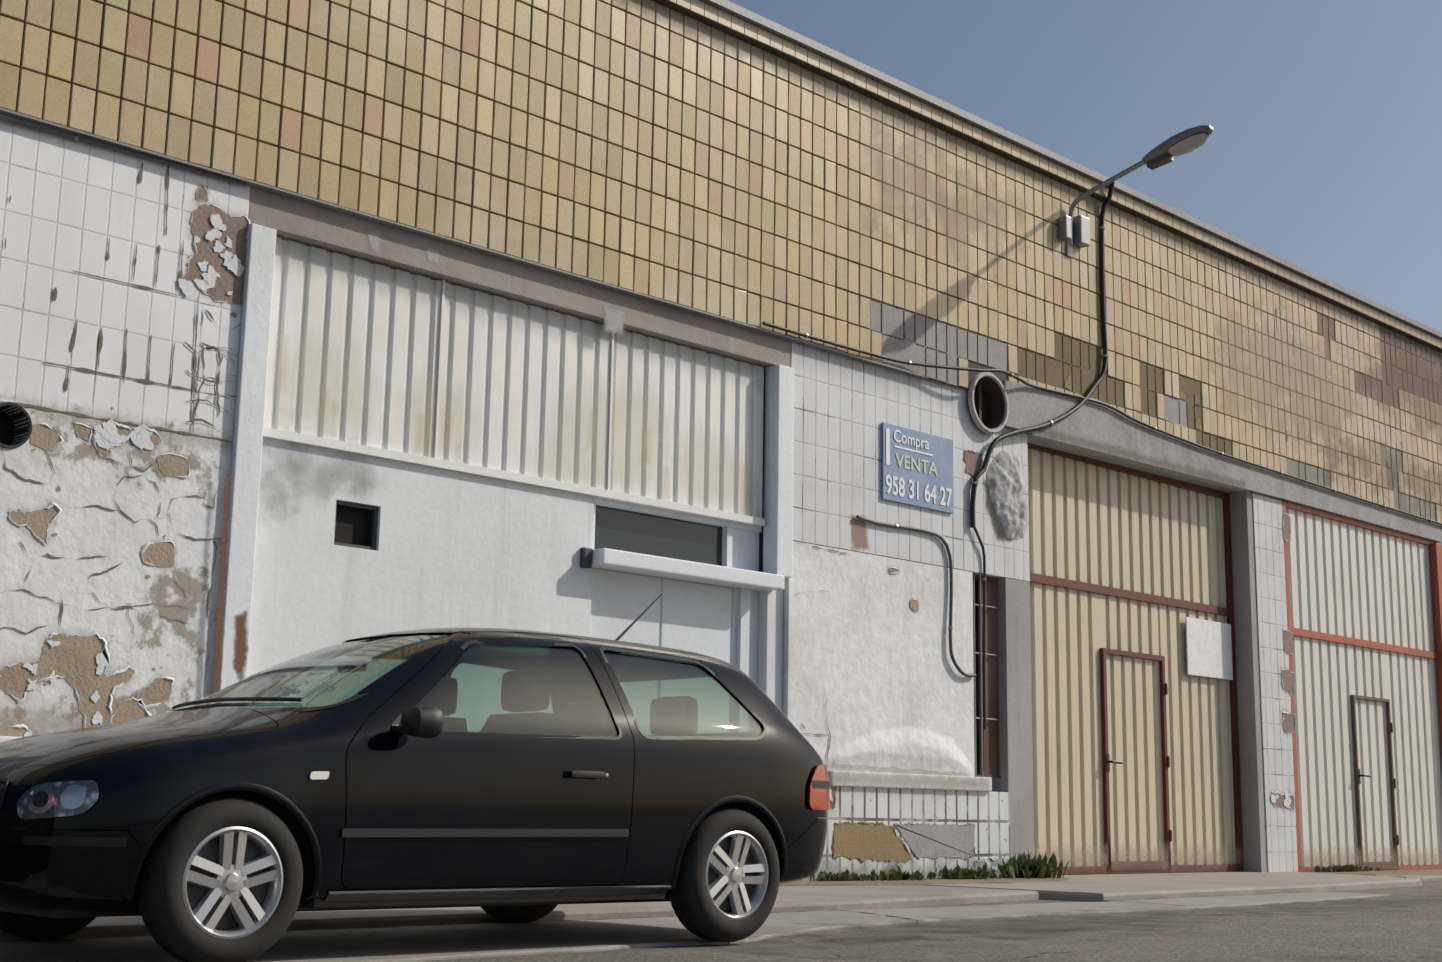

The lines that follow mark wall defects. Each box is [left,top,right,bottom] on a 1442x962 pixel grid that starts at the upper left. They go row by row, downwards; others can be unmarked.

spalling [178,185,251,318]
peeling [870,299,1232,456]
peeling [1353,325,1442,409]
spalling [8,485,62,555]
spalling [28,407,191,479]
crack [0,163,241,699]
spalling [140,535,175,579]
corrosion [213,471,248,693]
peeling [1286,458,1330,488]
peeling [1380,444,1436,521]
spalling [0,632,174,728]
spalling [828,773,1006,877]